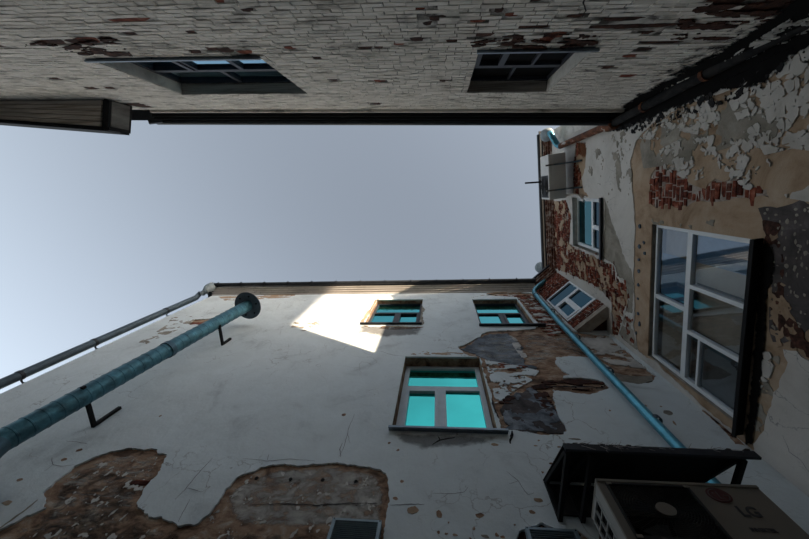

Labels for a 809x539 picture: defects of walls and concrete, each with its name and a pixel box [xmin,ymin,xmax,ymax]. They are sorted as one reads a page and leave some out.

peeling [25,18,150,57]
spalling [415,7,446,26]
peeling [470,0,809,62]
spalling [412,46,809,451]
spalling [0,449,398,539]